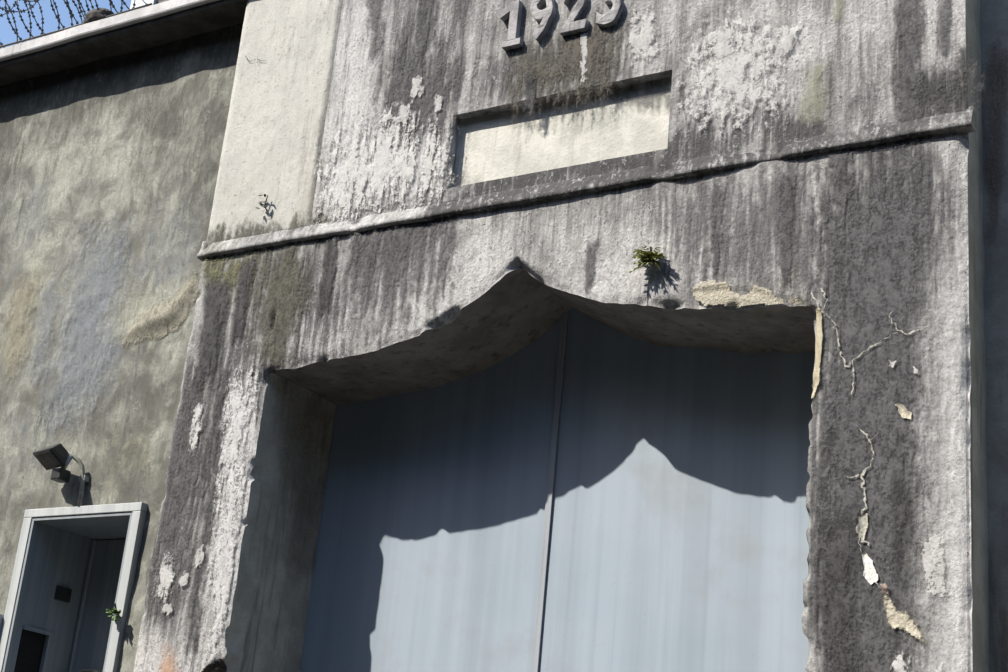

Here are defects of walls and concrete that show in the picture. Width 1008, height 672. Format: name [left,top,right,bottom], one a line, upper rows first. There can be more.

damp [373,0,464,152]
damp [891,0,983,123]
peeling [314,76,453,226]
damp [147,173,469,669]
damp [584,237,599,292]
spalling [691,280,804,309]
damp [664,135,953,672]
spalling [811,308,823,399]
crack [808,288,931,395]
peeling [856,299,968,672]
peeling [157,544,204,616]
spalling [201,659,227,672]